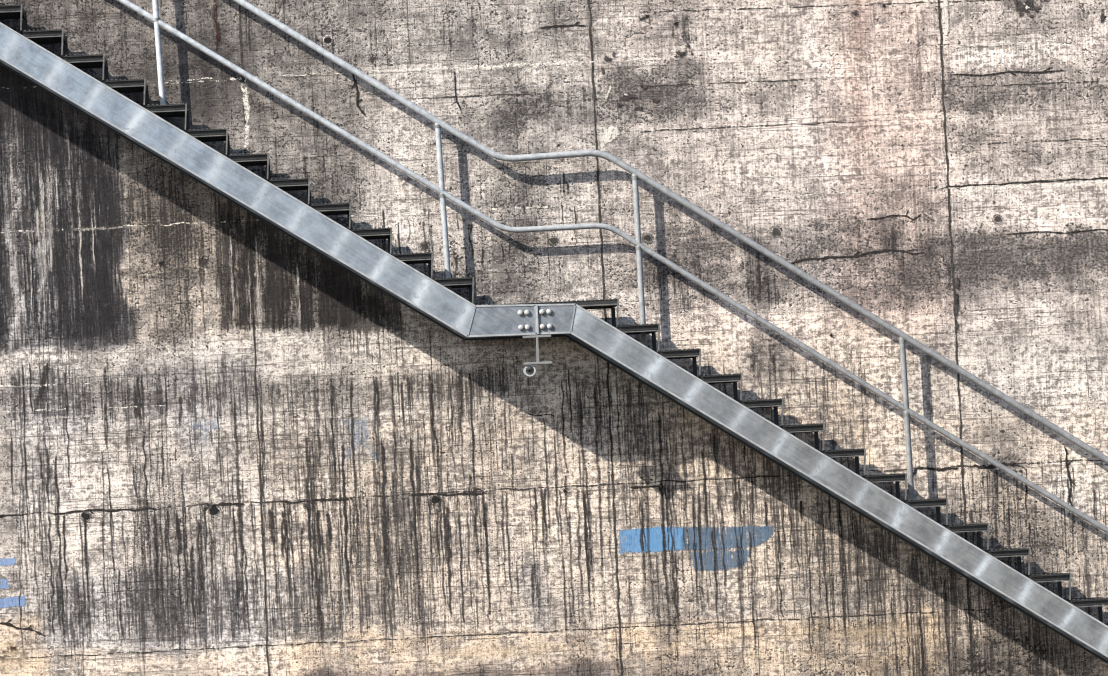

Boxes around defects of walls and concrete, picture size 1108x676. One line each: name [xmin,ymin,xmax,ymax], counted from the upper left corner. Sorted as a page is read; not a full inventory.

crack [951,67,1067,77]
damp [0,91,134,343]
crack [791,248,925,264]
crack [867,209,921,220]
crack [934,177,1108,190]
damp [2,363,518,671]
damp [531,369,614,643]
damp [617,411,1051,676]
damp [1065,462,1103,567]
crack [0,618,46,637]